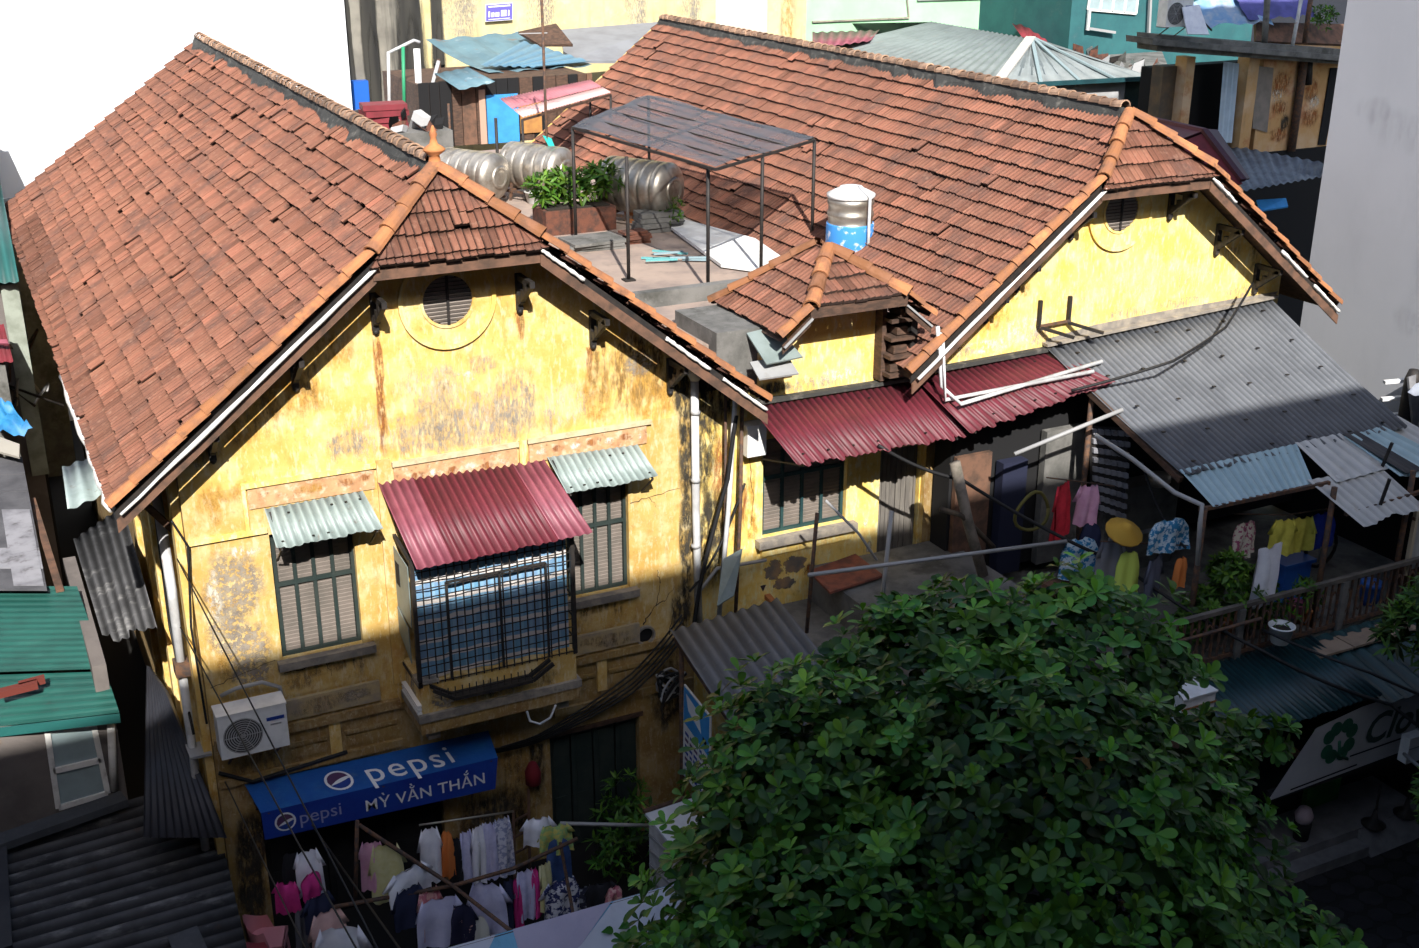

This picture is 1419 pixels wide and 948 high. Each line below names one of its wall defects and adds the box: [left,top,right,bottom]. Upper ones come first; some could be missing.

corrosion [373,342,385,440]
water stain [333,358,528,452]
water stain [545,339,733,629]
flaking render [208,547,269,684]
flaking render [764,556,810,589]